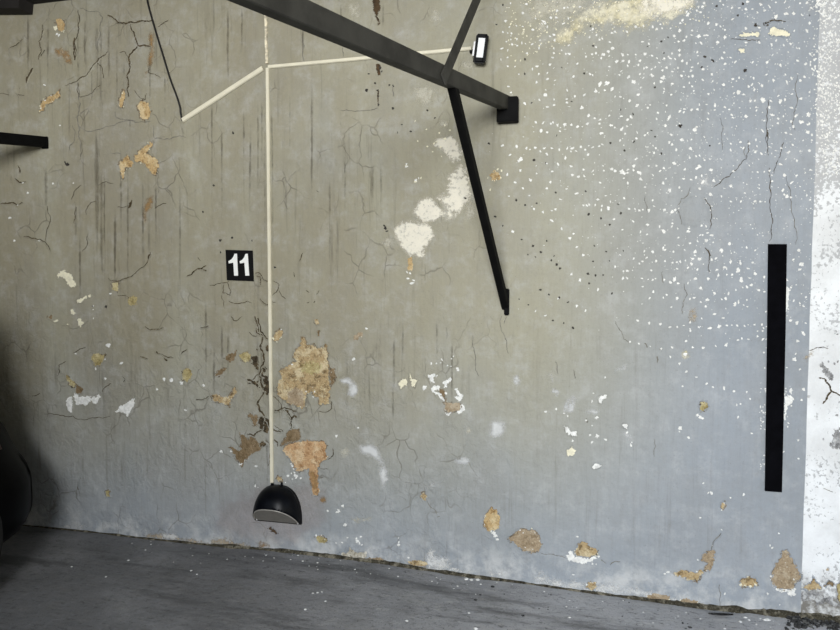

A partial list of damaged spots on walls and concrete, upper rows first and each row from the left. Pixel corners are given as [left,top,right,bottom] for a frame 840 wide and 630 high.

crack [65,8,184,157]
damp [384,122,474,257]
crack [140,349,188,362]
crack [187,253,319,464]
peeling [210,318,338,410]
peeling [397,356,465,416]
peeling [219,411,270,468]
peeling [275,426,329,497]
peeling [482,506,544,554]
peeling [566,536,600,565]
peeling [664,545,716,584]
peeling [767,545,840,607]